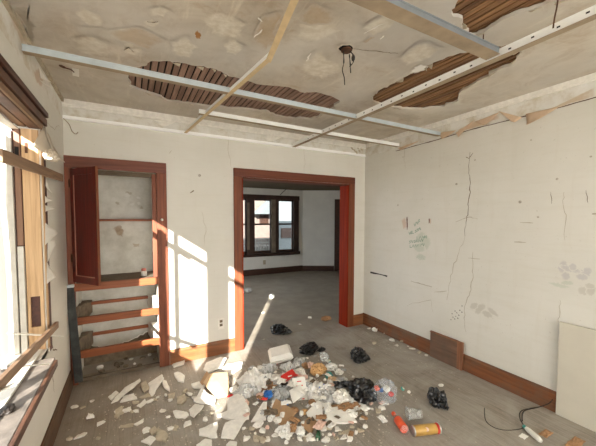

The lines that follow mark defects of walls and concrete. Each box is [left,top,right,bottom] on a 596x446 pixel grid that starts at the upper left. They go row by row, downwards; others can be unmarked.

flaking render [452,0,546,36]
flaking render [129,36,339,118]
flaking render [373,41,480,103]
flaking render [393,52,522,109]
crack [447,153,477,331]
flaking render [84,345,158,373]
flaking render [122,331,150,343]